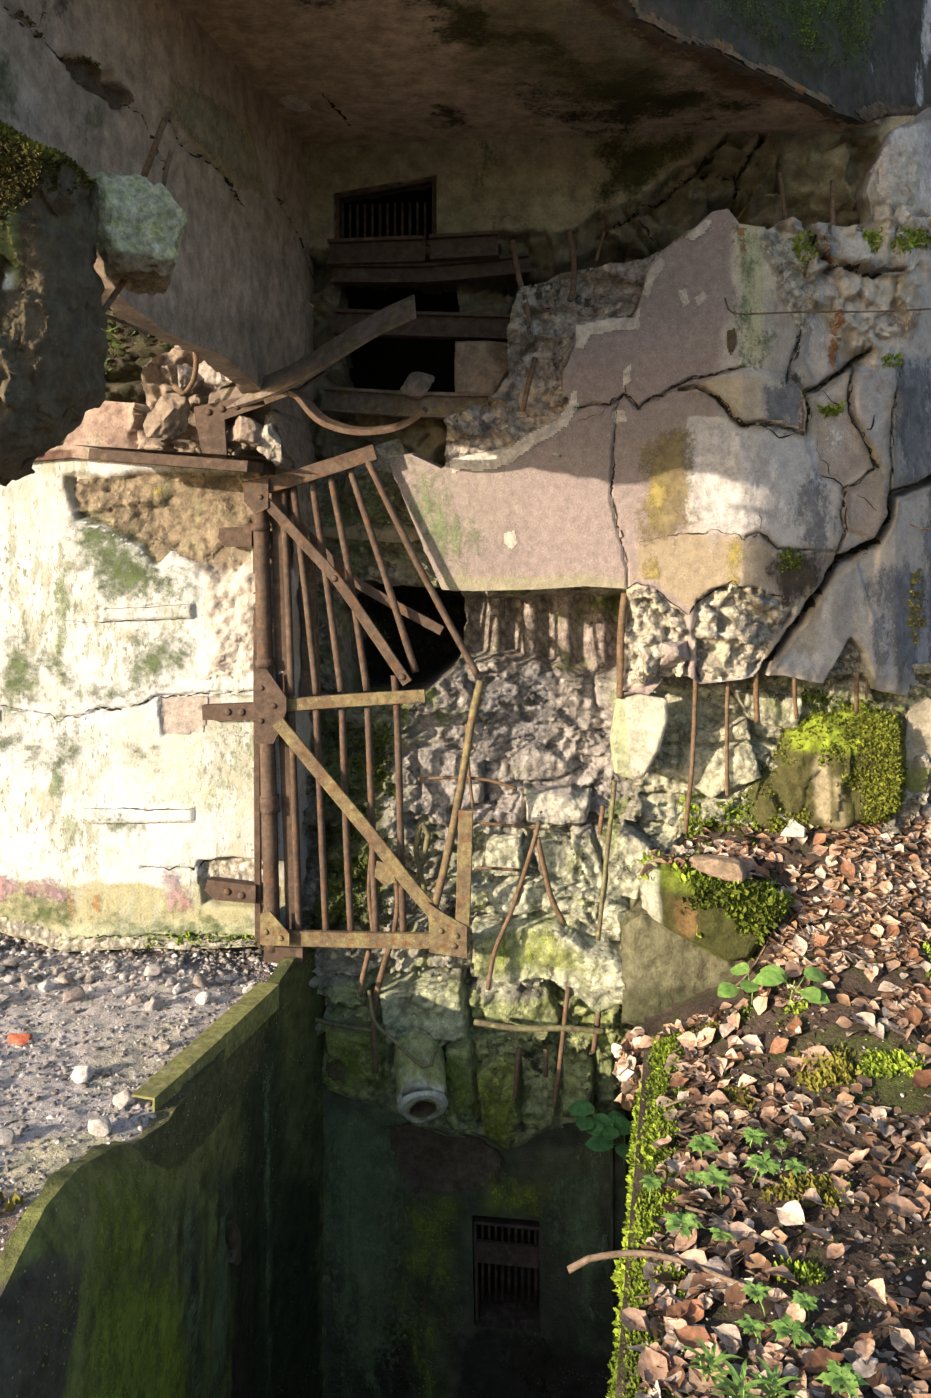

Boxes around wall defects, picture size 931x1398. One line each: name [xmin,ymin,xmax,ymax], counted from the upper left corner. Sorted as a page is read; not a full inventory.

spalling [622,0,836,113]
water stain [915,0,931,106]
spalling [574,258,665,349]
spalling [450,391,579,473]
crack [575,314,918,664]
spalling [73,473,289,679]
crack [1,690,253,722]
peeling [160,696,208,735]
spalling [627,585,789,684]
spalling [827,639,867,679]
water stain [107,871,227,948]
water stain [185,1067,273,1398]